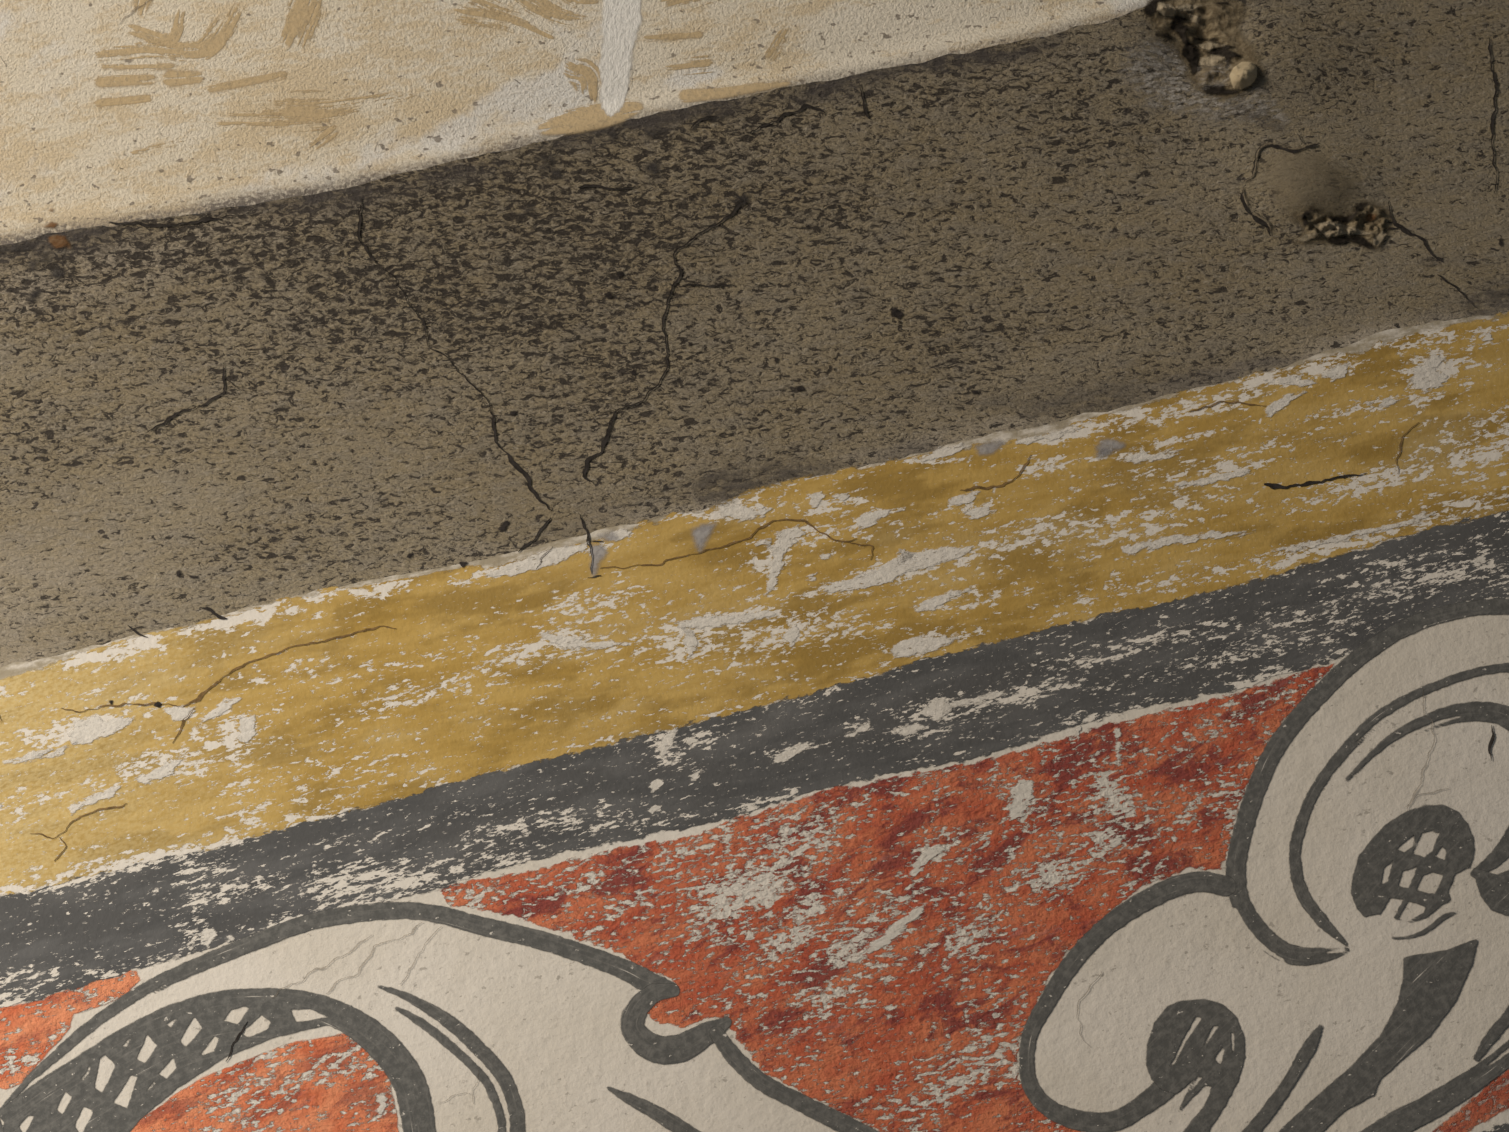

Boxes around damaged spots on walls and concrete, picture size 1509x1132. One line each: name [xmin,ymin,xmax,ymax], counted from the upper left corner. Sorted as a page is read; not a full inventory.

spalling [1144,0,1262,98]
crack [1385,201,1477,308]
crack [357,195,874,578]
crack [1264,422,1419,489]
peeling [486,529,631,577]
peeling [807,546,972,594]
crack [200,607,227,620]
crack [62,625,397,743]
peeling [153,697,257,742]
peeling [894,691,1012,738]
crack [30,803,127,861]
peeling [851,903,926,962]